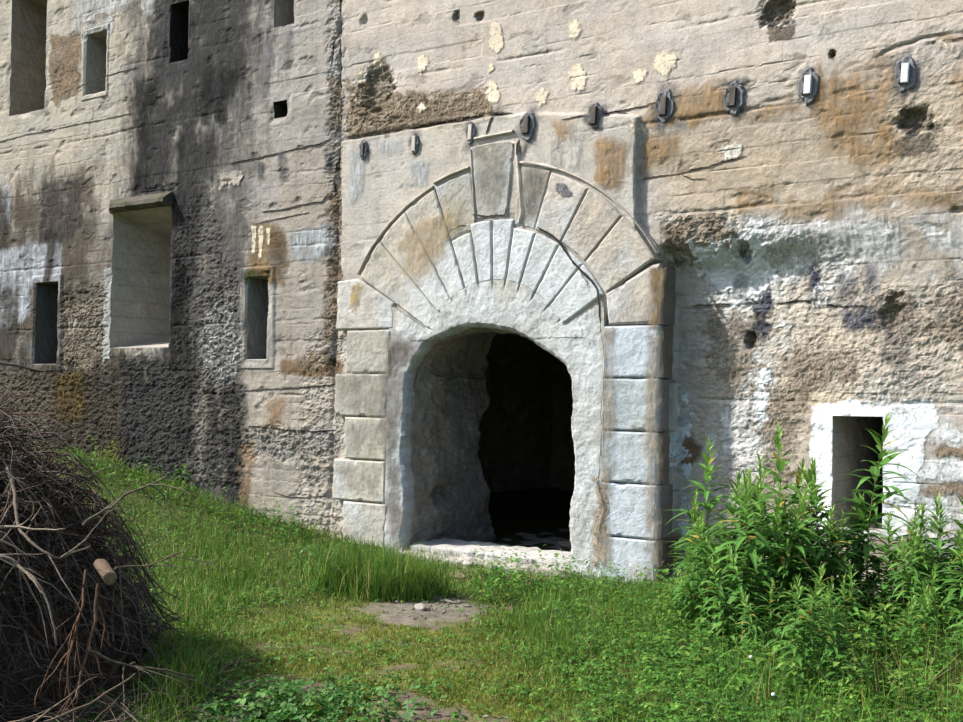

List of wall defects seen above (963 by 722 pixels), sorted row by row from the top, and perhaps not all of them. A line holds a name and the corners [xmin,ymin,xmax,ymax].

spalling [758,0,796,42]
crack [231,0,513,255]
spalling [326,57,492,139]
corrosion [643,85,726,168]
crack [643,156,744,180]
spalling [895,103,943,156]
leakage [0,0,274,510]
spalling [296,185,345,373]
peeling [659,209,963,541]